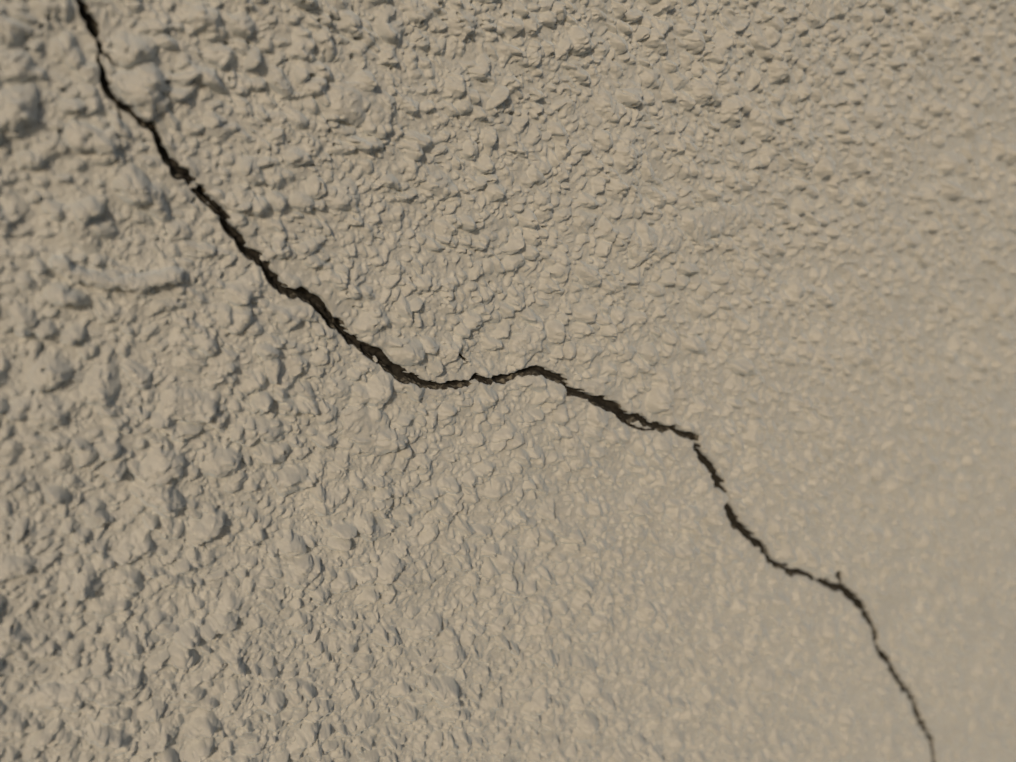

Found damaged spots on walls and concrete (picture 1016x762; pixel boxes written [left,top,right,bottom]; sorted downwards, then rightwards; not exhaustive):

crack [75,0,727,493]
crack [724,503,935,762]